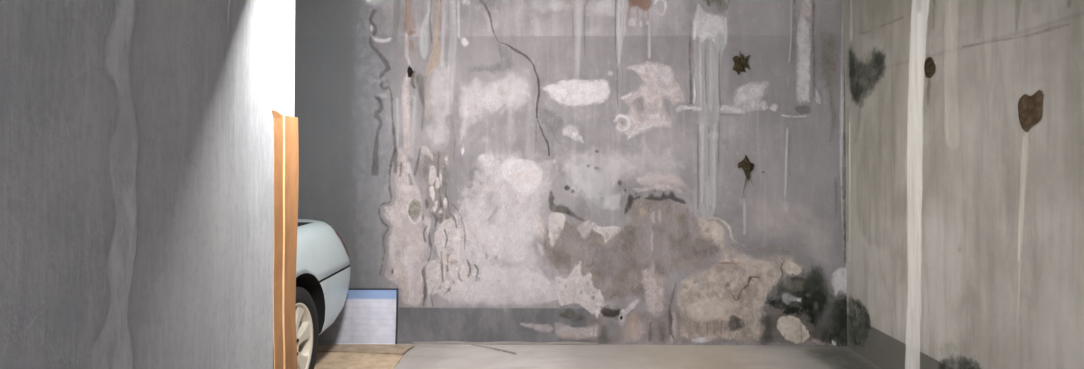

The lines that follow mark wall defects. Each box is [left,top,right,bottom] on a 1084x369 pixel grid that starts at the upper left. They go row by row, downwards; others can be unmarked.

crack [473,0,564,156]
leakage [96,0,137,369]
peeling [421,146,479,306]
peeling [537,212,566,255]
peeling [522,260,623,339]
peeling [582,220,621,243]
leakage [352,0,886,369]
peeling [668,217,803,343]
leakage [880,0,935,369]
leakage [939,341,980,369]